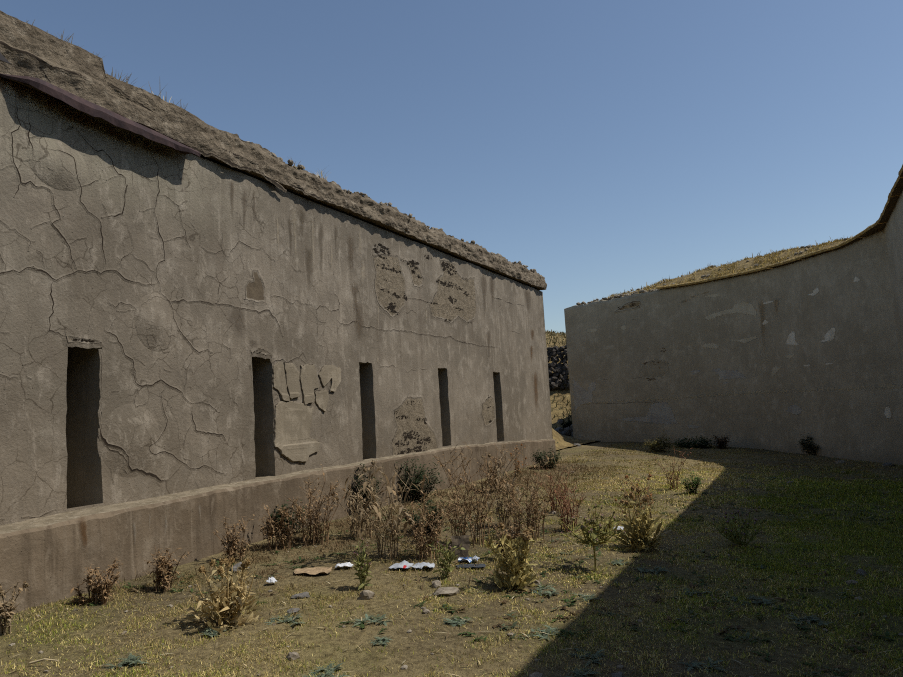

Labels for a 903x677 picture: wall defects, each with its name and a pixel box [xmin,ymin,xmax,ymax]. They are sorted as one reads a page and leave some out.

crack [0,40,524,485]
spalling [371,243,477,325]
peeling [251,345,341,465]
spalling [390,394,439,456]
crack [0,508,56,522]